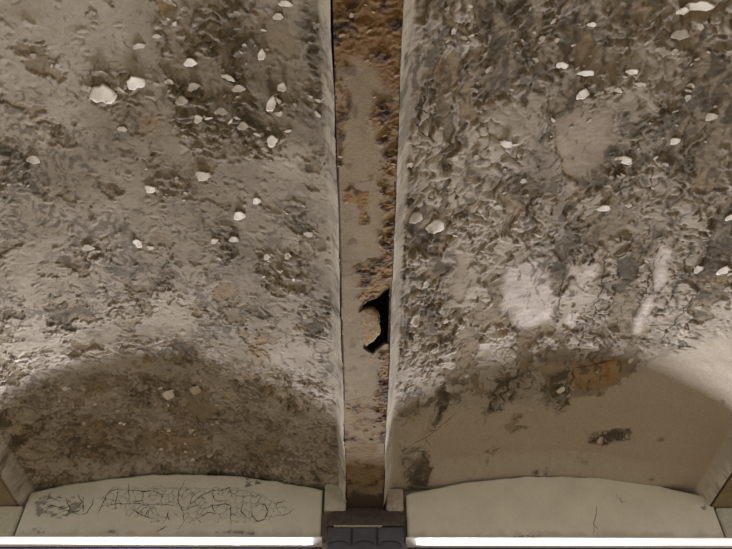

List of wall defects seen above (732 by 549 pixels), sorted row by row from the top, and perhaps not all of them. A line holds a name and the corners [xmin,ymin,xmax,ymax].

peeling [405,0,732,342]
peeling [386,183,553,433]
damp [0,300,341,430]
peeling [537,364,579,417]
corrosion [568,355,627,392]
damp [0,426,46,488]
damp [200,467,336,489]
peeling [584,426,637,447]
crack [42,480,292,532]